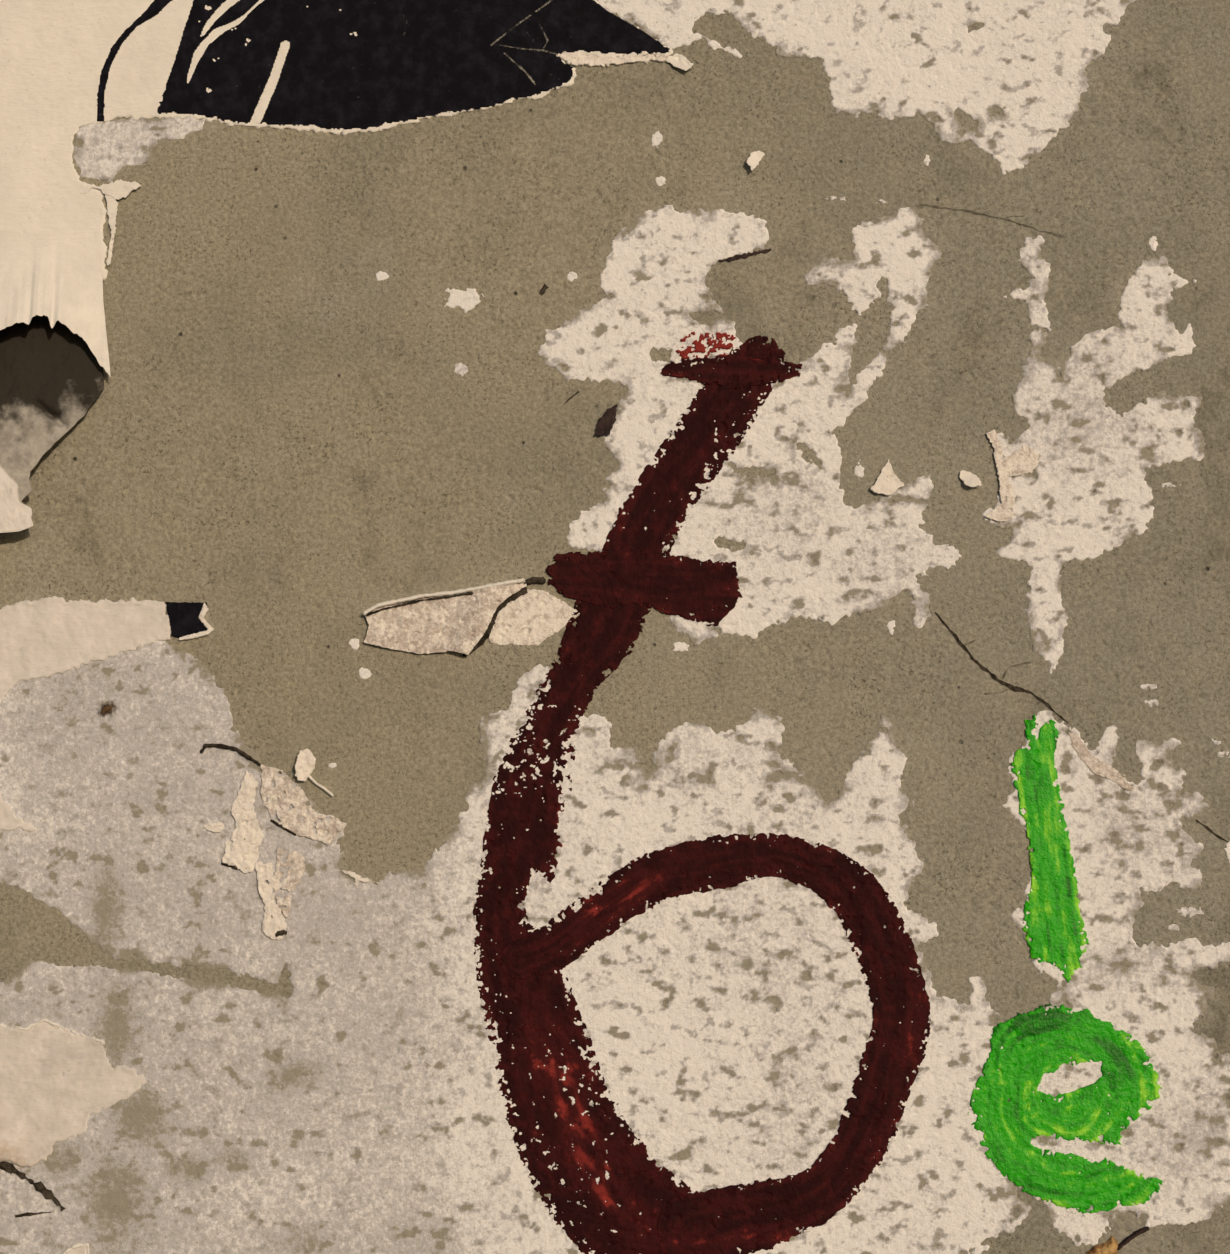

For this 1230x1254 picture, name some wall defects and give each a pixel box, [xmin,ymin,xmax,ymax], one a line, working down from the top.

peeling [596,0,1135,175]
peeling [537,205,771,552]
peeling [662,207,959,646]
peeling [959,470,982,487]
peeling [982,235,1206,674]
peeling [362,577,580,658]
crack [935,612,1068,723]
crack [1196,819,1228,842]
peeling [0,641,1230,1254]